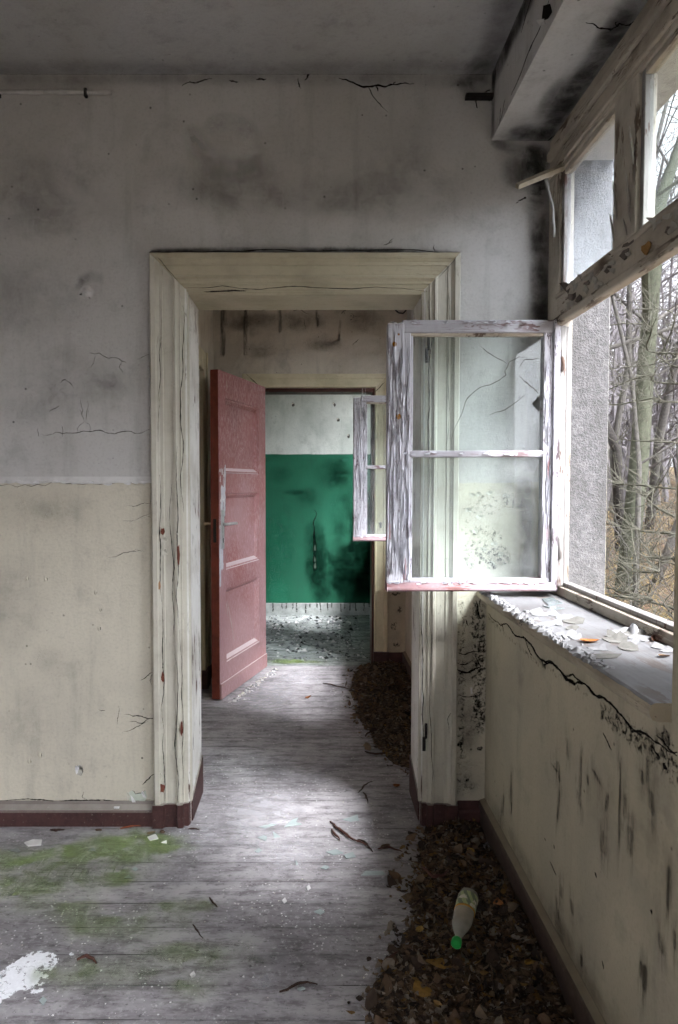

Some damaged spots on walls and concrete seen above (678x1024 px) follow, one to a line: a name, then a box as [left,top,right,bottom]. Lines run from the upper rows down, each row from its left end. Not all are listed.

crack [339,78,413,112]
water stain [515,148,548,320]
crack [91,239,453,802]
water stain [272,505,370,613]
water stain [457,603,498,758]
crack [420,597,678,795]
peeling [479,591,673,669]
water stain [601,705,678,782]